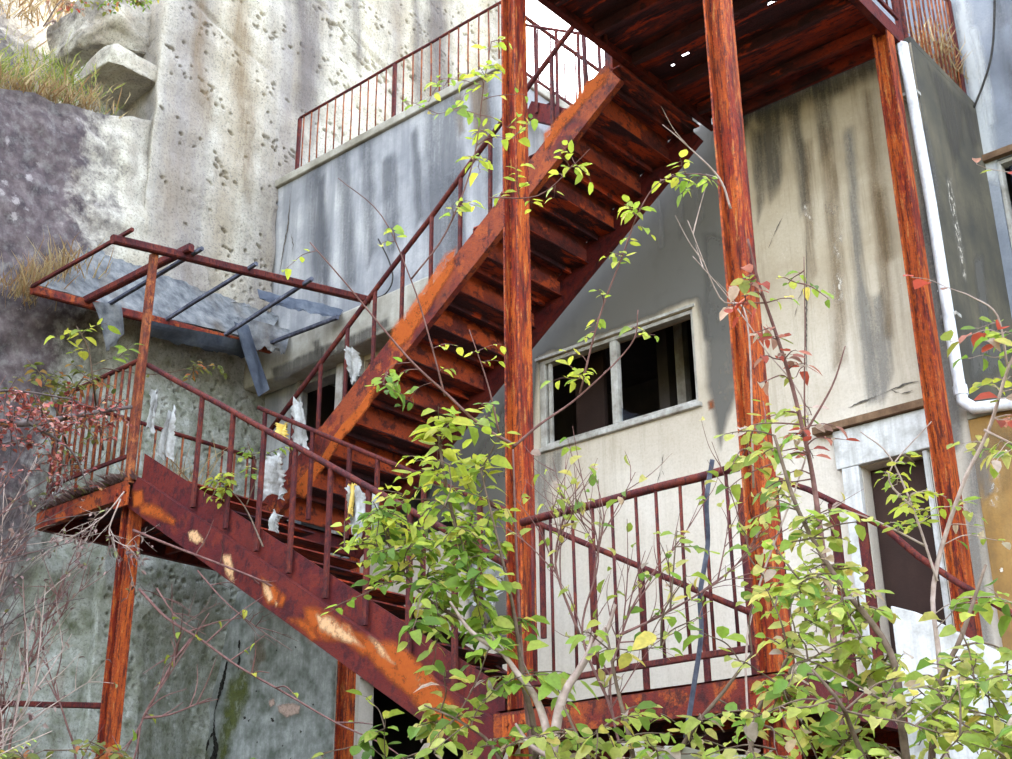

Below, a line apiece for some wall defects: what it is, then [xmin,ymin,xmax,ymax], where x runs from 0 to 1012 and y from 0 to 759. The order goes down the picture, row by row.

water stain [413,0,461,265]
water stain [478,82,498,189]
rust [544,70,608,150]
water stain [754,102,807,206]
water stain [311,169,326,282]
water stain [343,157,352,284]
rust [390,250,455,346]
water stain [848,132,889,401]
water stain [923,235,960,448]
rust [296,385,377,497]
crack [206,640,241,759]